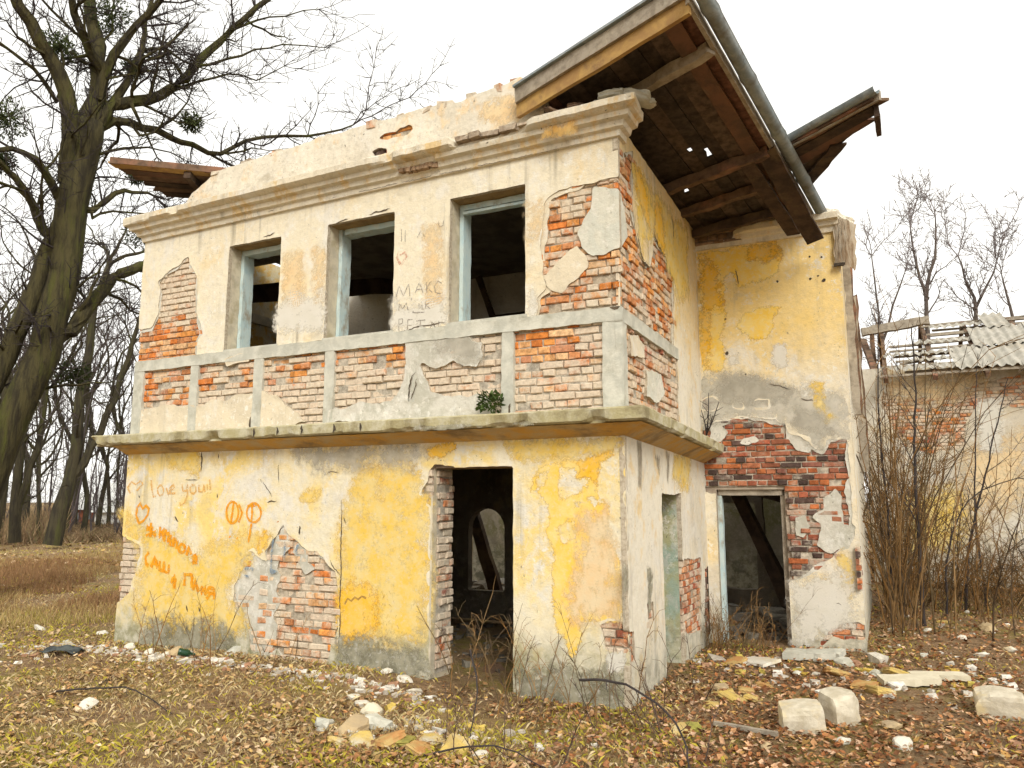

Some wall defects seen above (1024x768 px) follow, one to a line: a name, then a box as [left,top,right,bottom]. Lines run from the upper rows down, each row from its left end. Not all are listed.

flaking render [138,257,203,361]
flaking render [525,149,788,373]
damp [697,256,854,449]
peeling [119,423,480,664]
crack [330,501,346,651]
peeling [503,436,633,673]
flaking render [679,558,709,633]
flaking render [703,417,865,647]